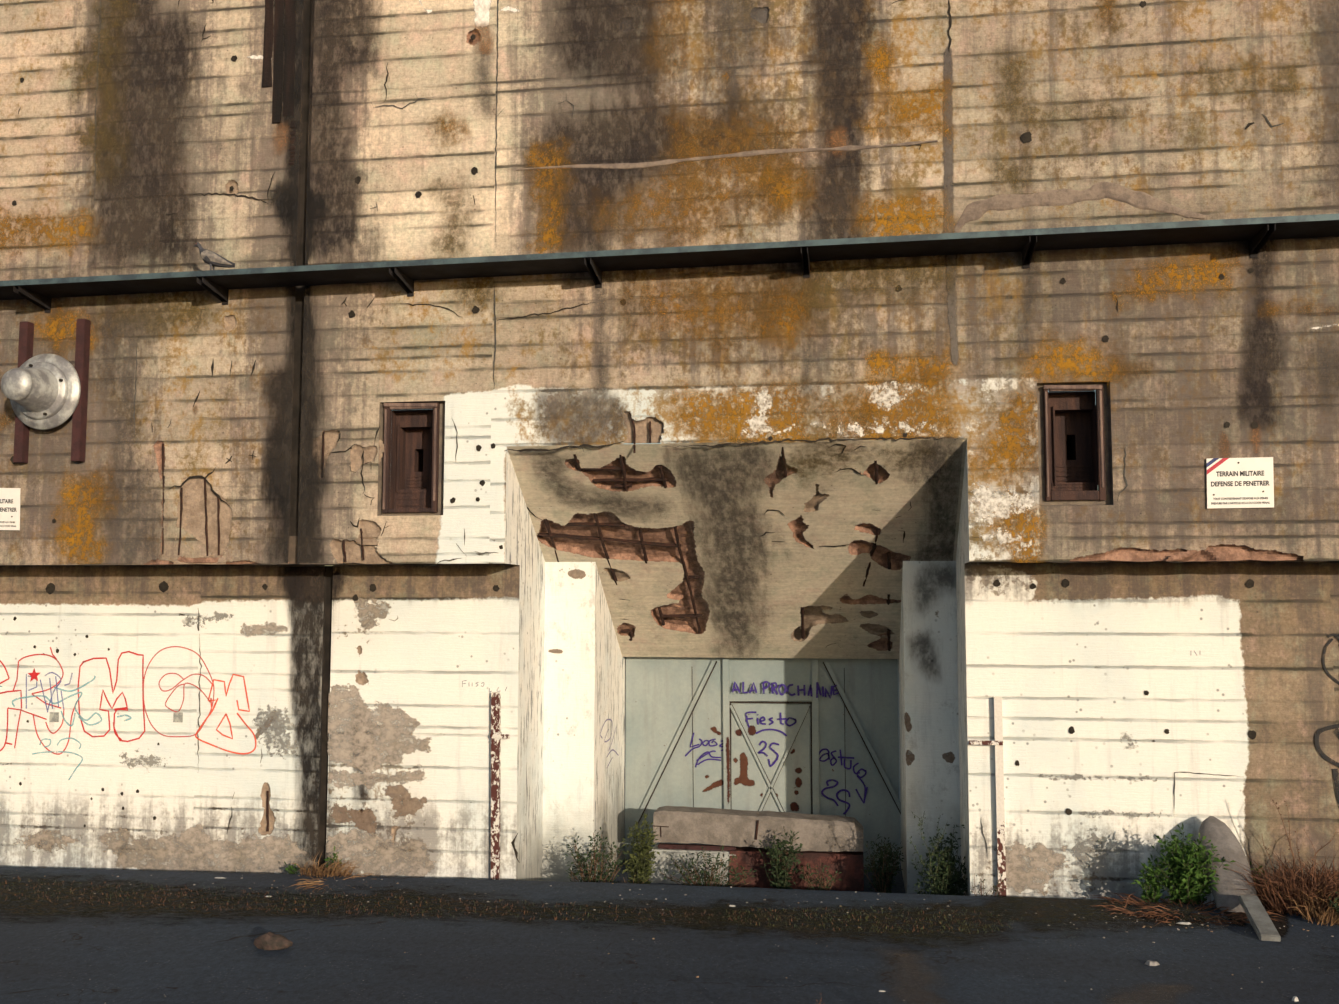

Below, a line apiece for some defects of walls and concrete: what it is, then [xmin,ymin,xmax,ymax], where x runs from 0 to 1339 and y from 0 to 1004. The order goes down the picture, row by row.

leakage [93,0,196,266]
leakage [536,0,760,251]
leakage [808,0,876,239]
leakage [1239,239,1282,426]
peeling [183,611,288,637]
leakage [261,285,342,874]
spalling [329,519,393,564]
spalling [537,511,710,634]
spalling [787,484,829,549]
spalling [791,523,911,651]
spalling [1069,544,1308,562]
peeling [99,646,436,878]